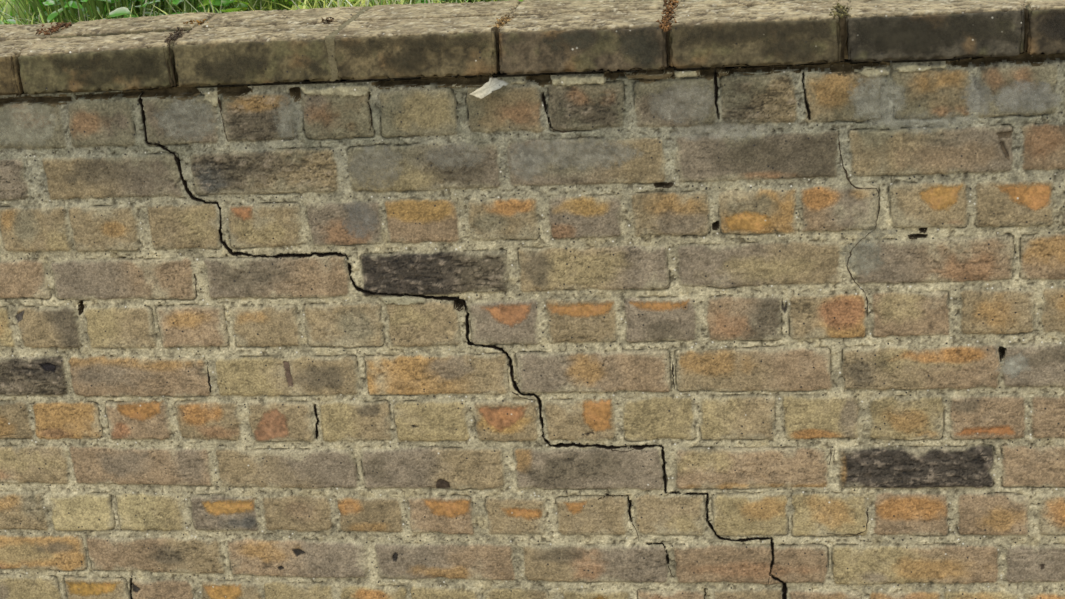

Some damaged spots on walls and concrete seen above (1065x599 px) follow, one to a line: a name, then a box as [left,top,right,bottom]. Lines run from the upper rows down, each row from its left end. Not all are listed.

crack [712,69,720,119]
crack [802,72,810,120]
crack [839,141,880,313]
crack [138,93,787,599]